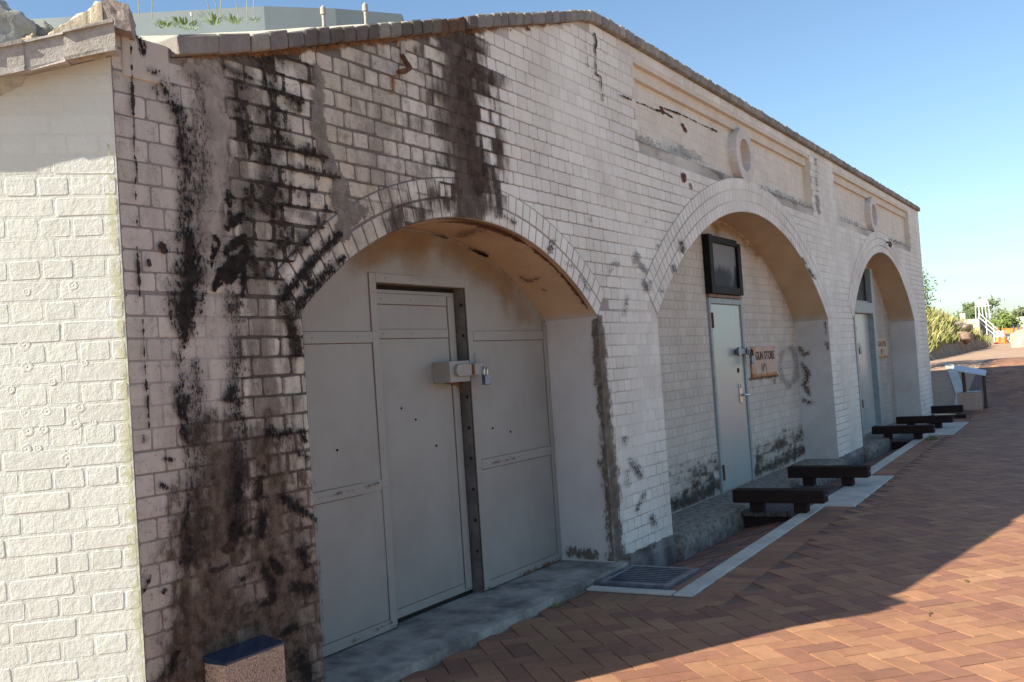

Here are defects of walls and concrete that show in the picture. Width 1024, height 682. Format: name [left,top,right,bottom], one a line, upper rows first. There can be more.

water stain [221,51,346,360]
water stain [388,29,517,234]
crack [584,32,717,132]
water stain [148,68,327,682]
water stain [566,315,656,562]
water stain [669,457,721,513]
water stain [755,428,805,478]